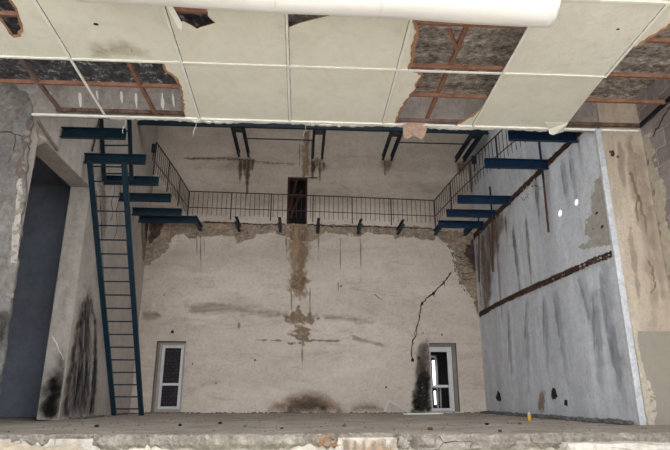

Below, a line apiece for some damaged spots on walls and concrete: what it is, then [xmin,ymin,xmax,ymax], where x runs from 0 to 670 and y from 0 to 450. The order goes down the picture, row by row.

peeling [110,118,402,128]
spalling [8,119,58,264]
peeling [141,221,478,312]
corrosion [473,132,612,317]
peeling [578,176,611,250]
crack [411,272,452,362]
leakage [275,395,341,412]